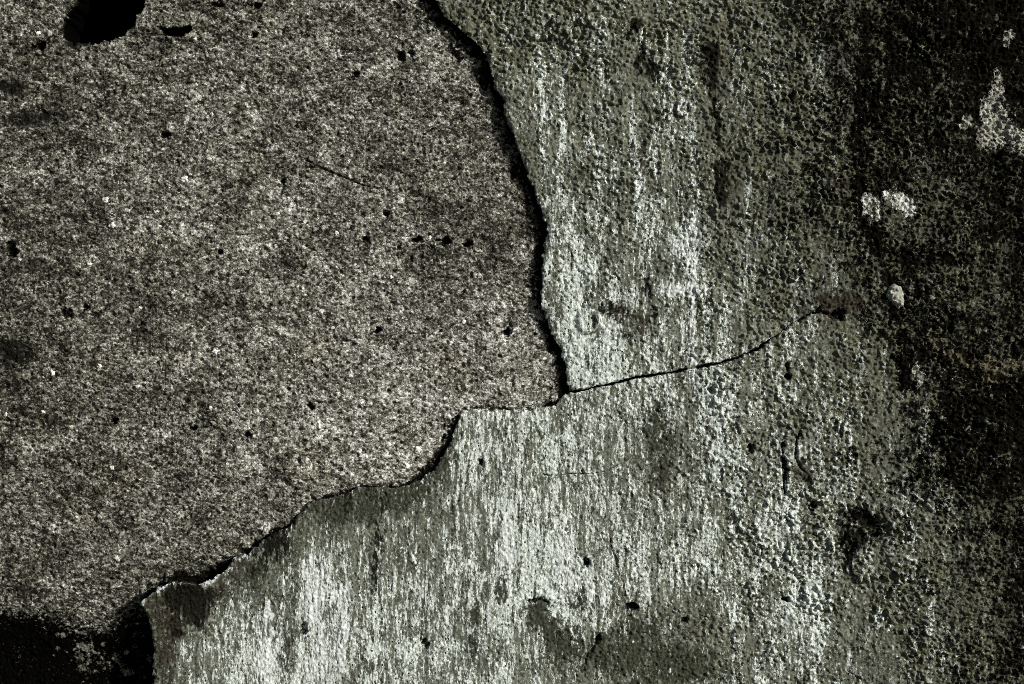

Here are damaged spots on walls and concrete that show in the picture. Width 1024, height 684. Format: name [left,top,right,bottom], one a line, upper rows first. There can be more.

spalling [0,0,567,684]
crack [566,307,835,394]
spalling [781,433,801,494]
spalling [840,447,858,468]
spalling [837,533,858,562]
spalling [842,507,885,538]
peeling [526,583,731,684]